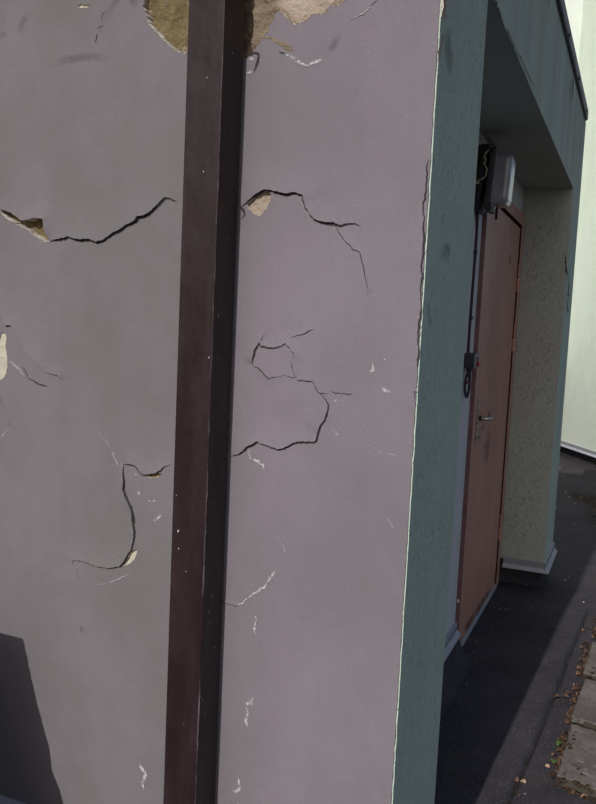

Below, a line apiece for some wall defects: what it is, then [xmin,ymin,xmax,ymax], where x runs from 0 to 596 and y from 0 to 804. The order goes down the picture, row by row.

flaking render [142,0,189,54]
flaking render [242,0,345,74]
crack [438,0,447,60]
flaking render [0,191,55,242]
crack [237,155,376,295]
crack [228,322,352,456]
crack [57,450,170,585]